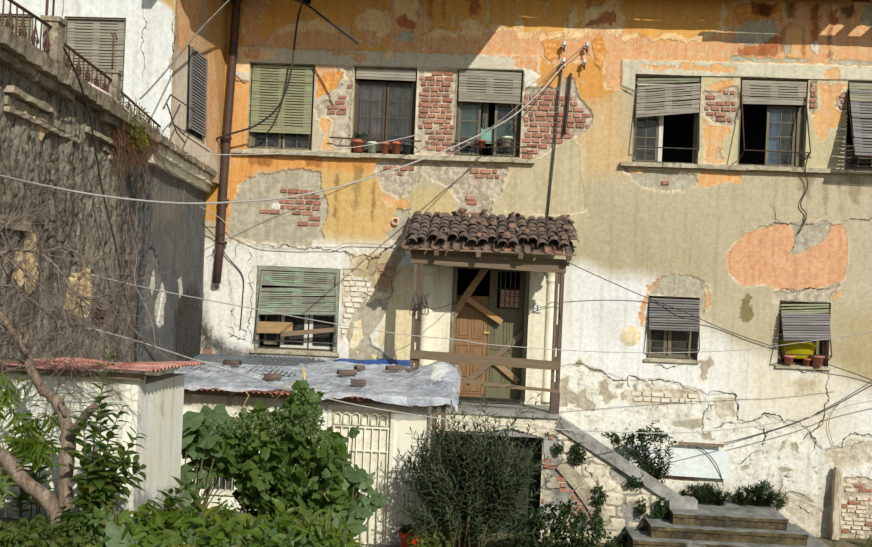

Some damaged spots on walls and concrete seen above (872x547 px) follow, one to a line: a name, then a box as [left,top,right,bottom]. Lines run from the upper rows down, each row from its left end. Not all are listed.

peeling [228,0,872,360]
flaking render [559,360,702,411]
flaking render [699,357,714,381]
crack [569,363,872,464]
flaking render [784,439,872,539]